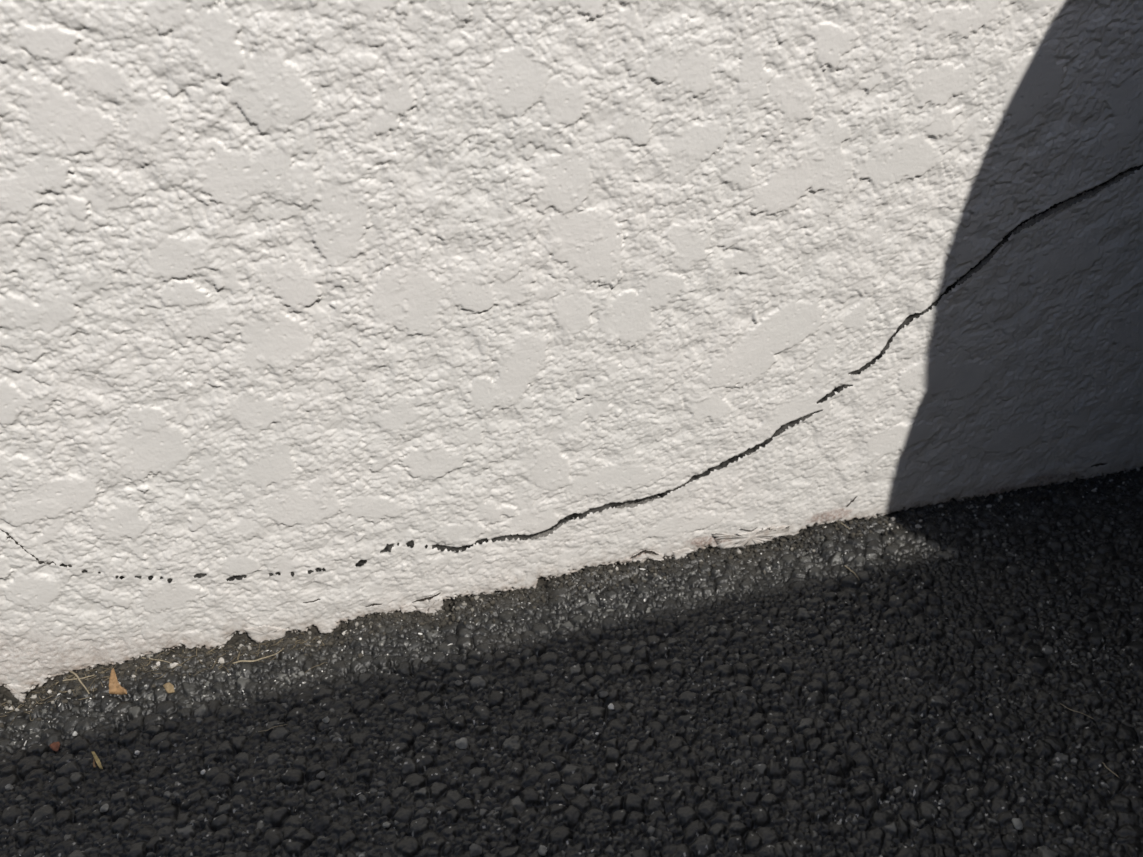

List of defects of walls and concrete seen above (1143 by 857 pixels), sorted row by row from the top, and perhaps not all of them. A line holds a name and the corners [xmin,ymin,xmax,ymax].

crack [0,529,326,583]
crack [355,165,1143,567]